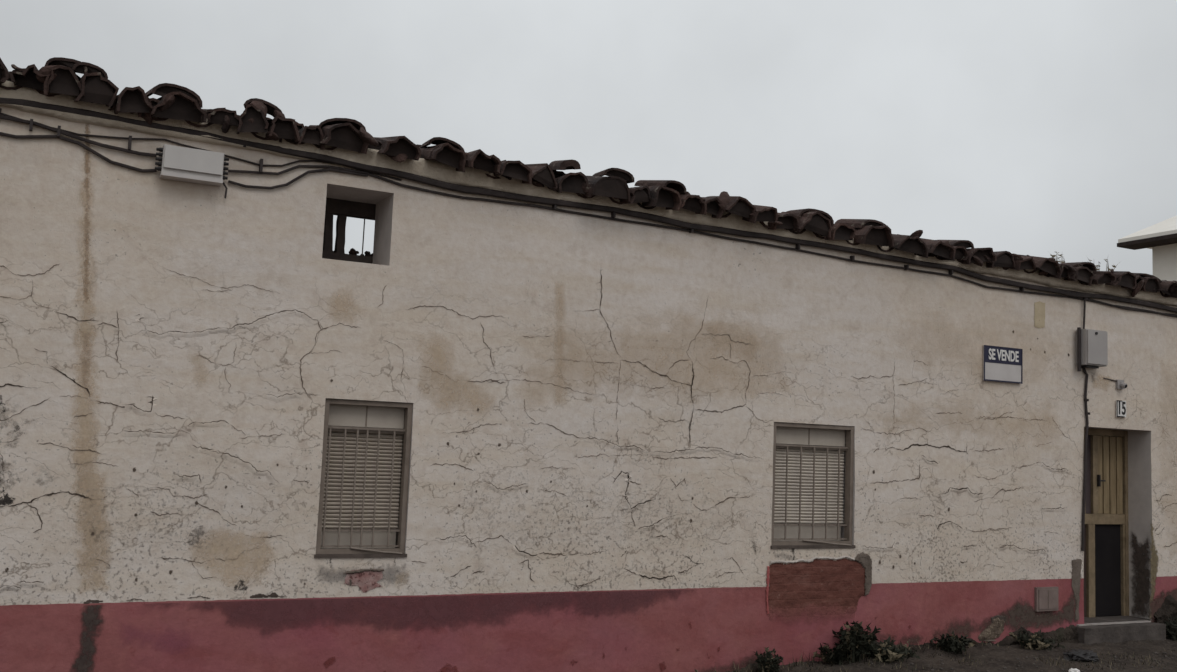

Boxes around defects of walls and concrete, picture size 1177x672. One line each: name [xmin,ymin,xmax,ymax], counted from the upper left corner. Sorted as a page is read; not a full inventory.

damp [74,125,106,585]
crack [0,264,355,403]
damp [0,472,15,505]
crack [0,349,309,579]
crack [378,267,791,589]
crack [854,360,1070,567]
damp [72,605,103,672]
spalling [344,568,384,593]
damp [198,535,681,633]
flaking render [766,552,901,620]
spalling [960,559,1082,647]
damp [1131,524,1158,618]